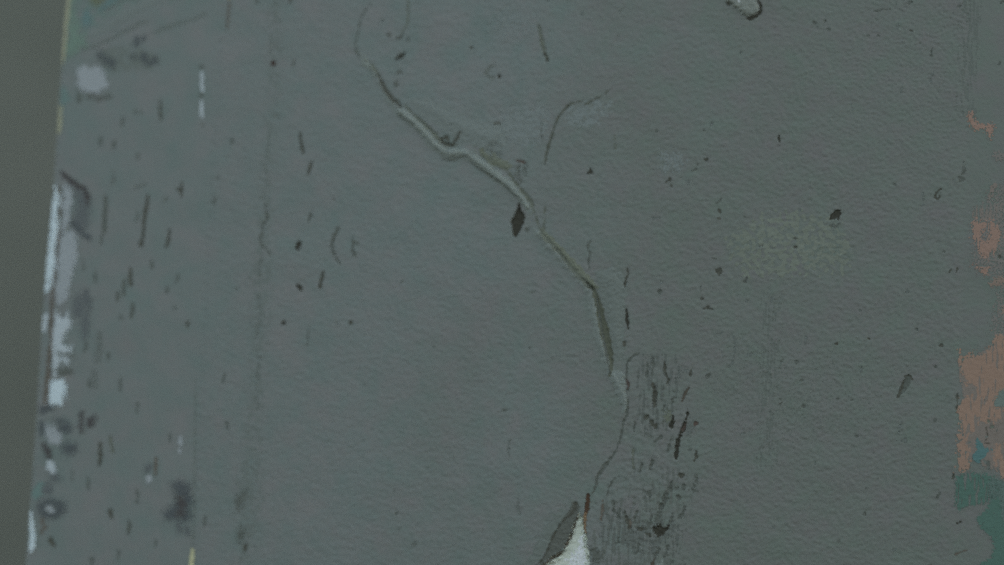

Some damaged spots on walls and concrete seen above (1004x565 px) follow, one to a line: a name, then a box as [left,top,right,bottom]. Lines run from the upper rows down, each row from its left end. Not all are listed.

crack [354,0,640,565]
peeling [949,217,1004,289]
spalling [633,356,698,462]
spalling [540,502,590,565]
spalling [611,473,686,555]